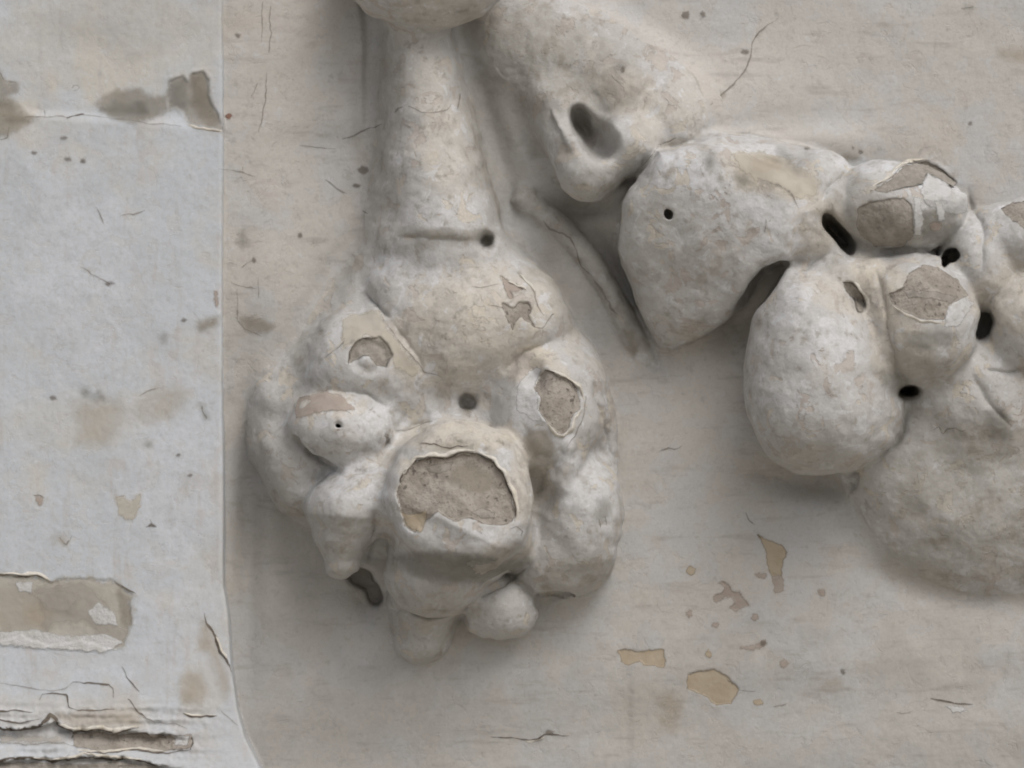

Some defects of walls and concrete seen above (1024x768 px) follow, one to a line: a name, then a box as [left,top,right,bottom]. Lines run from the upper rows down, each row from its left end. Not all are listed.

peeling [857,159,968,248]
peeling [492,273,538,330]
peeling [888,265,974,327]
peeling [339,311,426,376]
peeling [295,391,355,417]
peeling [516,368,584,439]
peeling [396,443,519,533]
peeling [755,535,787,593]
peeling [0,571,136,653]
crack [204,615,232,672]
peeling [618,649,666,667]
peeling [687,650,739,705]